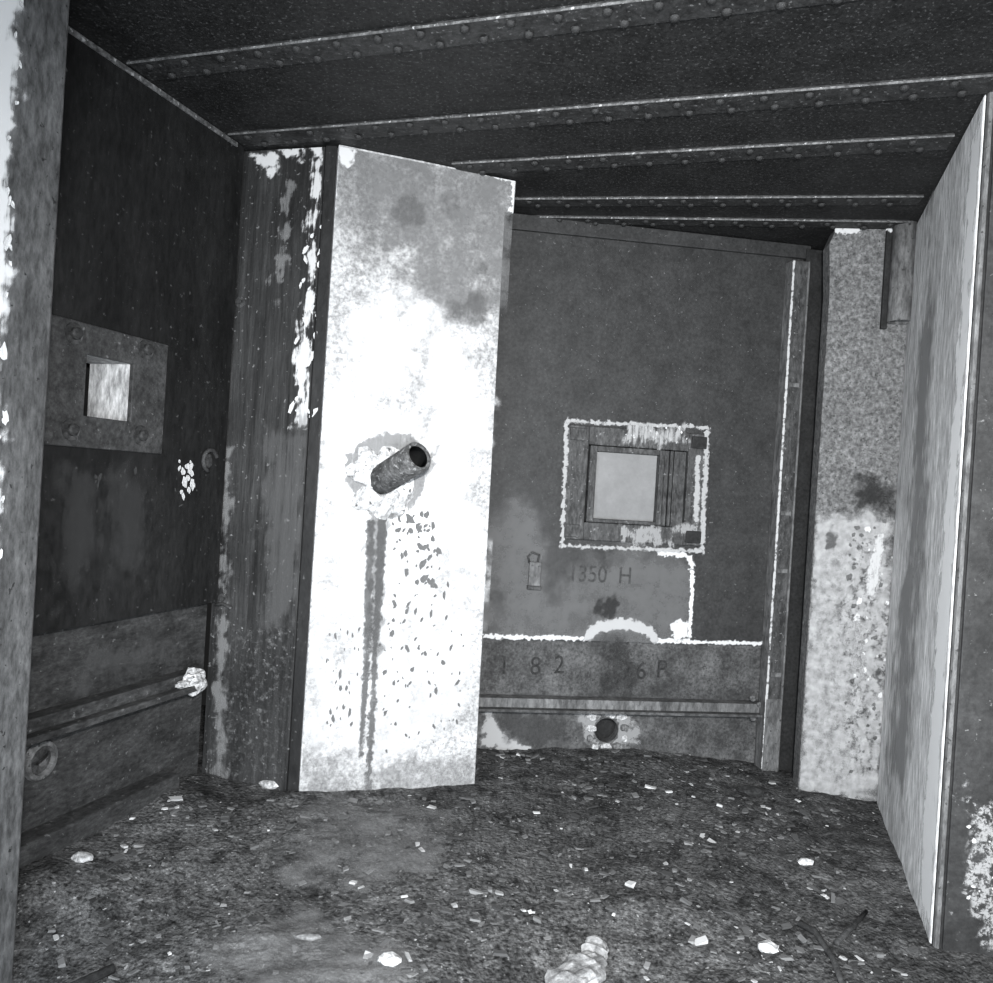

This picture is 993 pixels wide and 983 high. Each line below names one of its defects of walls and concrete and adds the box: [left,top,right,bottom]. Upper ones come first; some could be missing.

peeling [0,0,24,316]
peeling [250,147,323,427]
peeling [178,460,195,500]
corrosion [344,431,416,493]
corrosion [359,457,434,790]
peeling [482,261,795,768]
damp [825,532,837,550]
damp [856,474,894,512]
damp [886,286,934,791]
peeling [963,800,993,949]